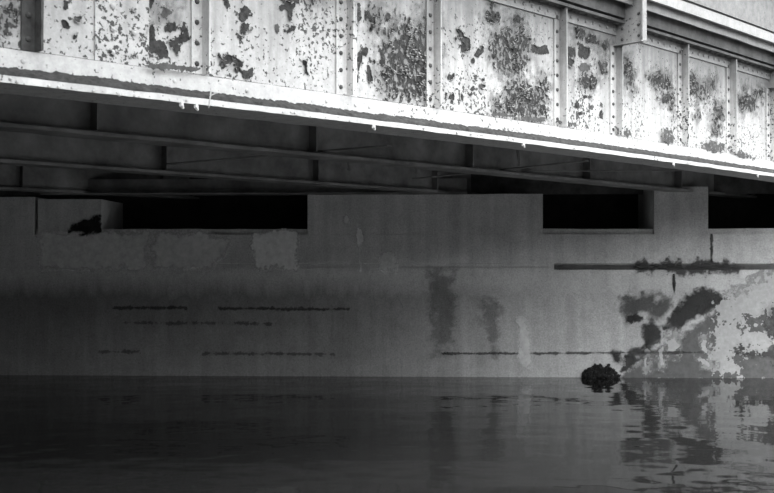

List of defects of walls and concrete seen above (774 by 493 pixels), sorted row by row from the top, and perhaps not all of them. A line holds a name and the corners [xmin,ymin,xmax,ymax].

peeling [61,0,83,39]
peeling [146,0,190,59]
peeling [217,52,254,80]
peeling [223,0,254,41]
peeling [275,0,321,34]
peeling [357,0,433,104]
peeling [455,1,552,119]
peeling [568,25,609,119]
peeling [689,68,726,140]
damp [620,291,672,322]
damp [693,262,774,378]
damp [635,327,682,378]